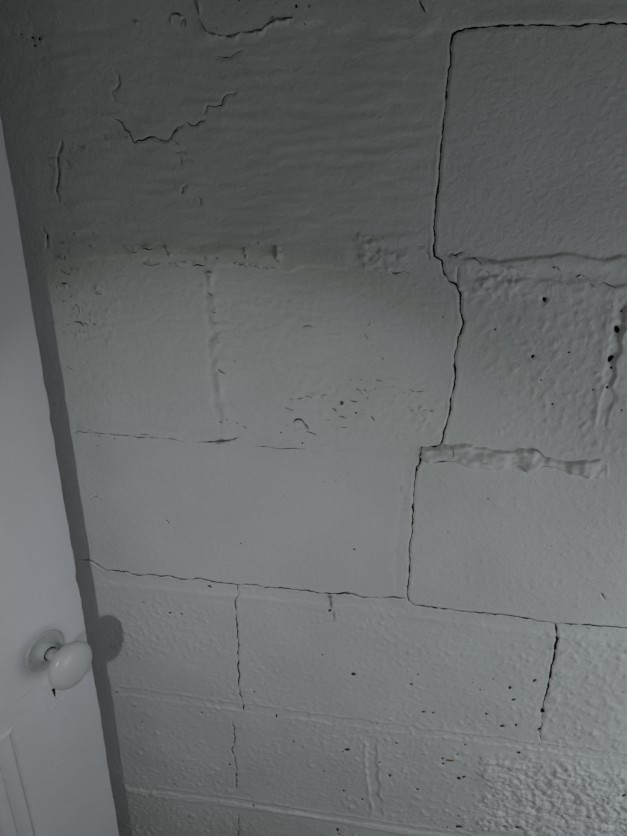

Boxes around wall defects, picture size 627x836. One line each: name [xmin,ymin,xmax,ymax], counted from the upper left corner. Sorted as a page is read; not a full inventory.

crack [47,139,80,201]
crack [78,21,627,741]